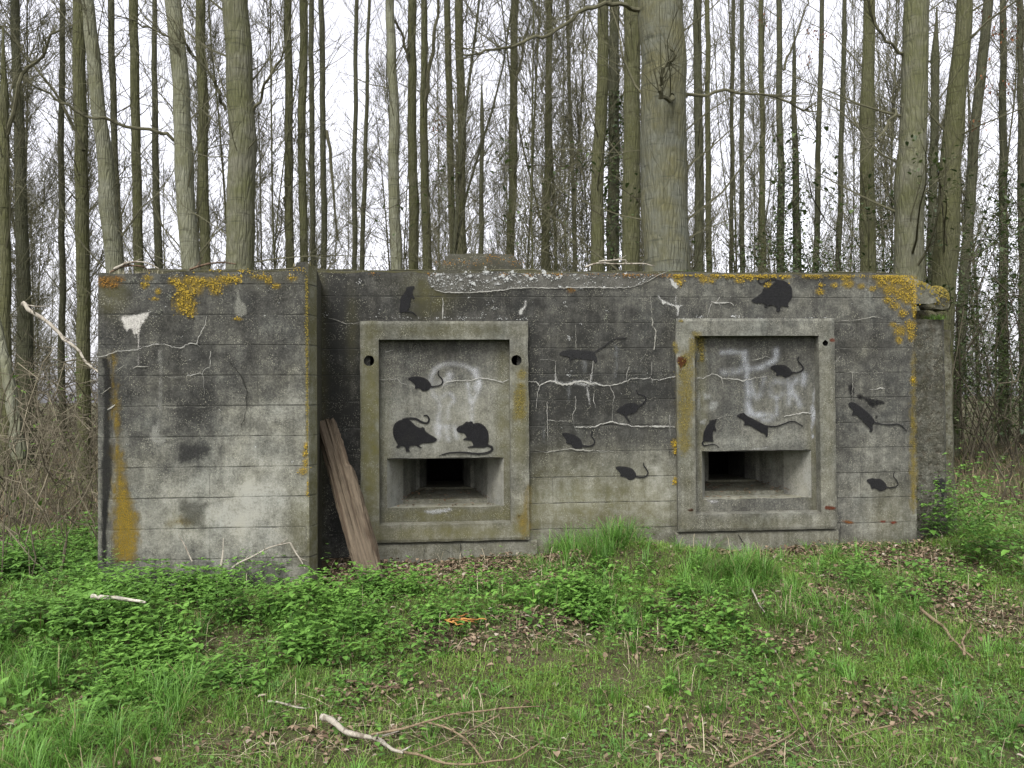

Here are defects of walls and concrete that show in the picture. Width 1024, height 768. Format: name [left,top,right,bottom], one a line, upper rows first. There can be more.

water stain [121,312,149,343]
crack [100,316,248,425]
crack [441,296,771,453]
water stain [101,358,112,567]